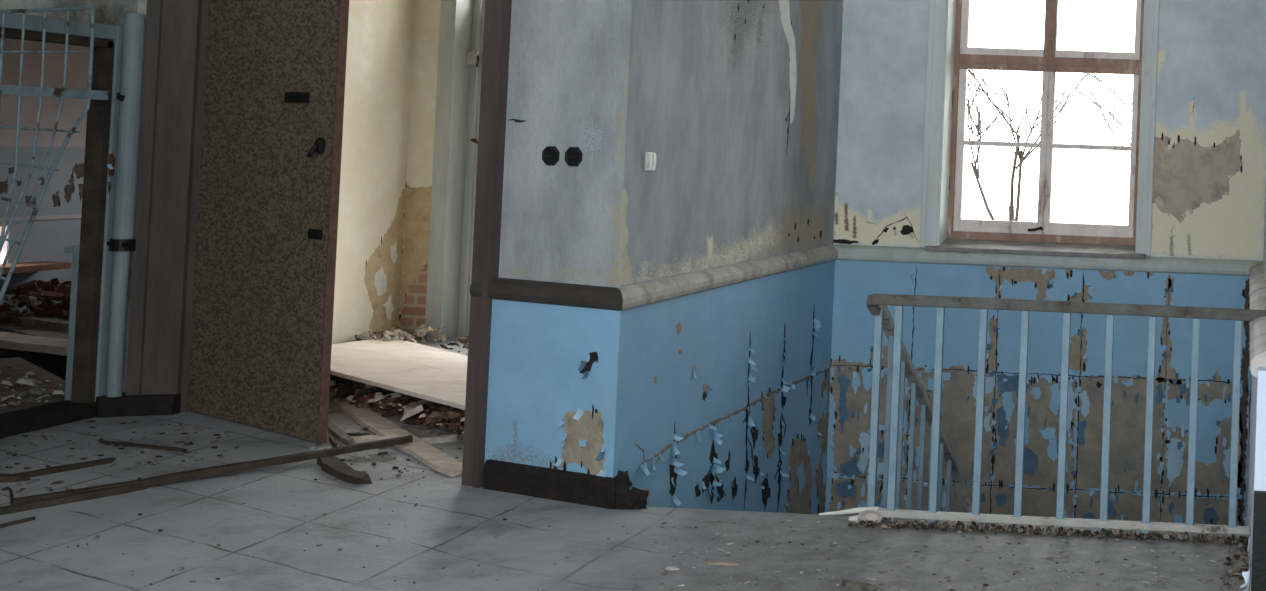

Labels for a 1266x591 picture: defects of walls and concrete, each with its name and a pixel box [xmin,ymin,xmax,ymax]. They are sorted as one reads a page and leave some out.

peeling [788,195,924,247]
spalling [364,182,432,335]
peeling [578,352,598,379]
peeling [550,404,607,477]
peeling [695,451,738,502]
peeling [750,266,1251,591]